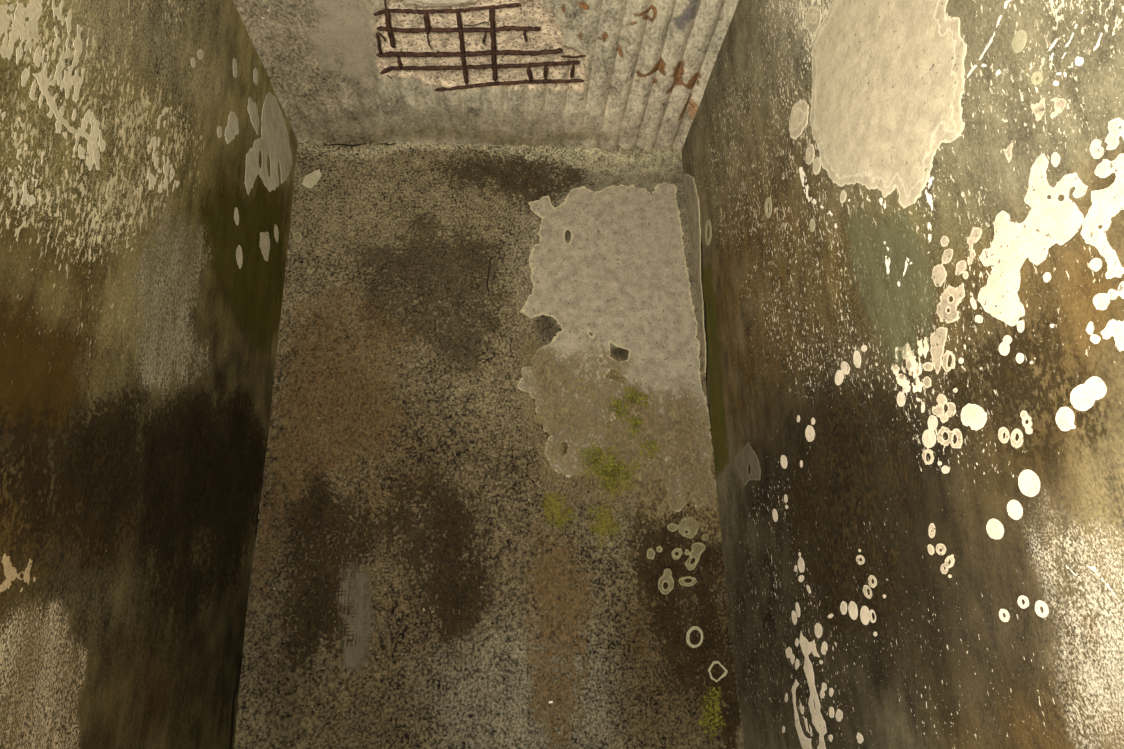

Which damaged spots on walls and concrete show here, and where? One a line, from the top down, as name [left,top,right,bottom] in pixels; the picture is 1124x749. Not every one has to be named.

peeling [217,68,293,195]
spalling [370,0,593,93]
flaking render [789,0,967,209]
peeling [1031,97,1066,121]
leakage [0,196,268,624]
peeling [260,224,279,261]
flaking render [517,173,717,586]
peeling [891,118,1124,474]
leakage [280,465,497,668]
peeling [782,549,886,749]